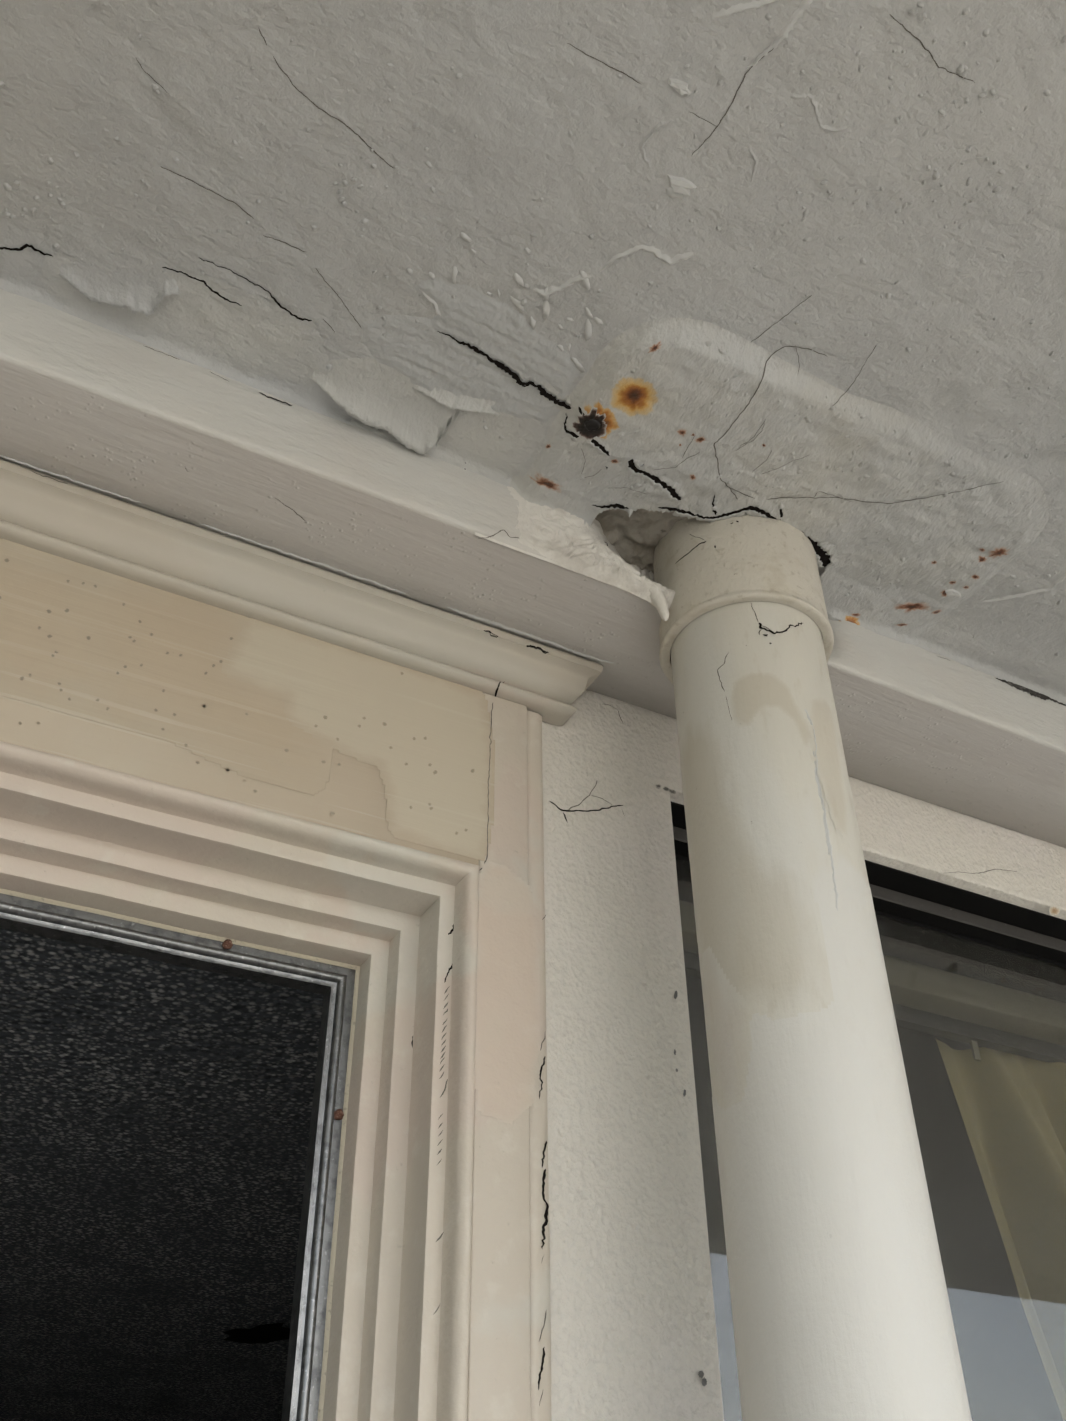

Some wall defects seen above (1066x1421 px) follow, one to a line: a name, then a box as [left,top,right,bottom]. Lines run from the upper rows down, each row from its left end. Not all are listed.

crack [0,244,52,256]
crack [162,167,361,331]
peeling [39,242,549,483]
peeling [487,270,603,372]
rust [571,375,661,442]
rust [646,339,664,354]
rust [676,428,708,447]
crack [438,295,1004,567]
crack [751,603,802,644]
crack [549,781,624,823]
crack [541,1141,549,1264]
crack [538,1312,546,1406]